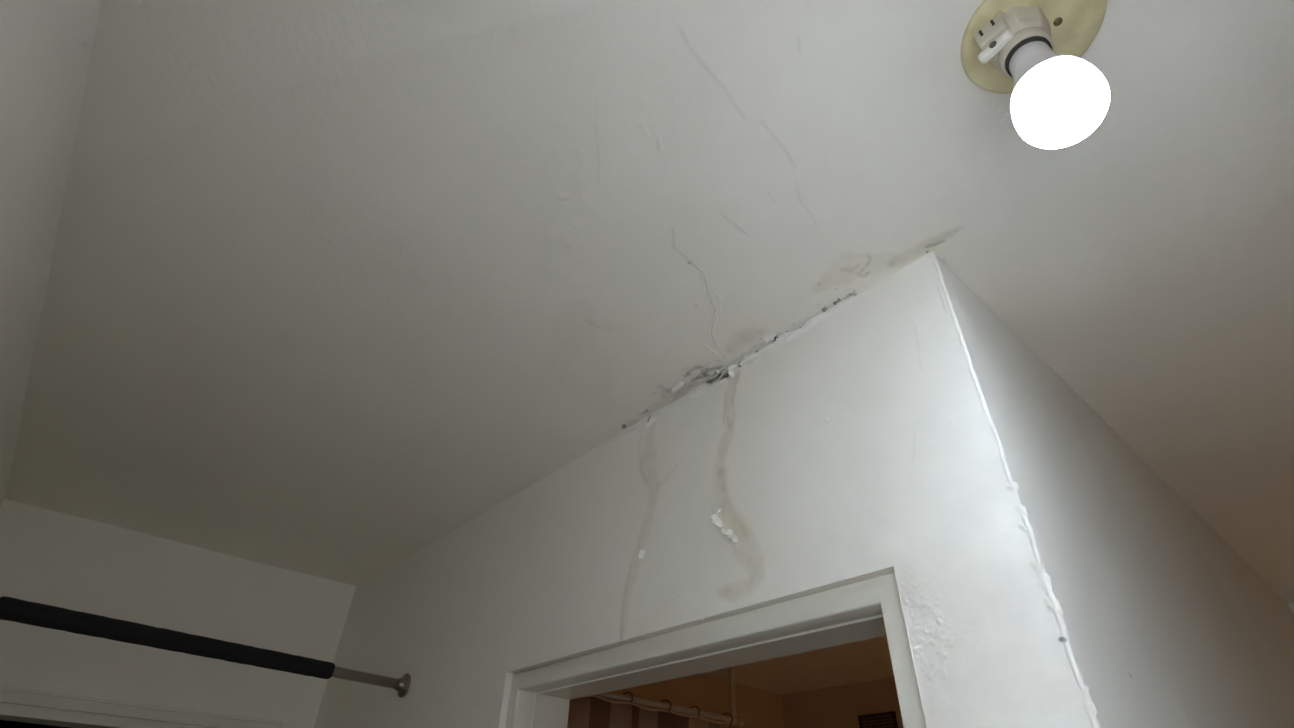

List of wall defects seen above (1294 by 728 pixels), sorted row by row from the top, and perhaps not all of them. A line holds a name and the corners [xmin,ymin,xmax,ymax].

peeling [609,296,858,446]